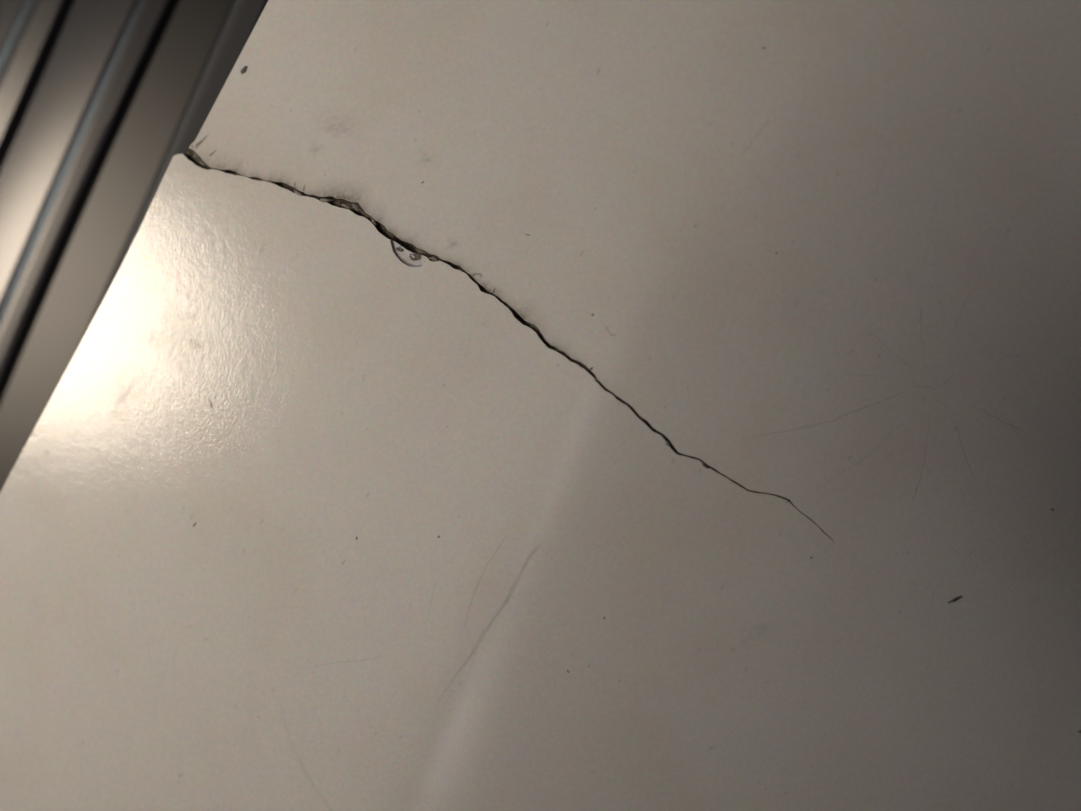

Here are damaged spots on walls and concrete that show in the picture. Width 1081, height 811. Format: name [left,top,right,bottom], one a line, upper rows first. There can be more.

crack [183,141,834,542]